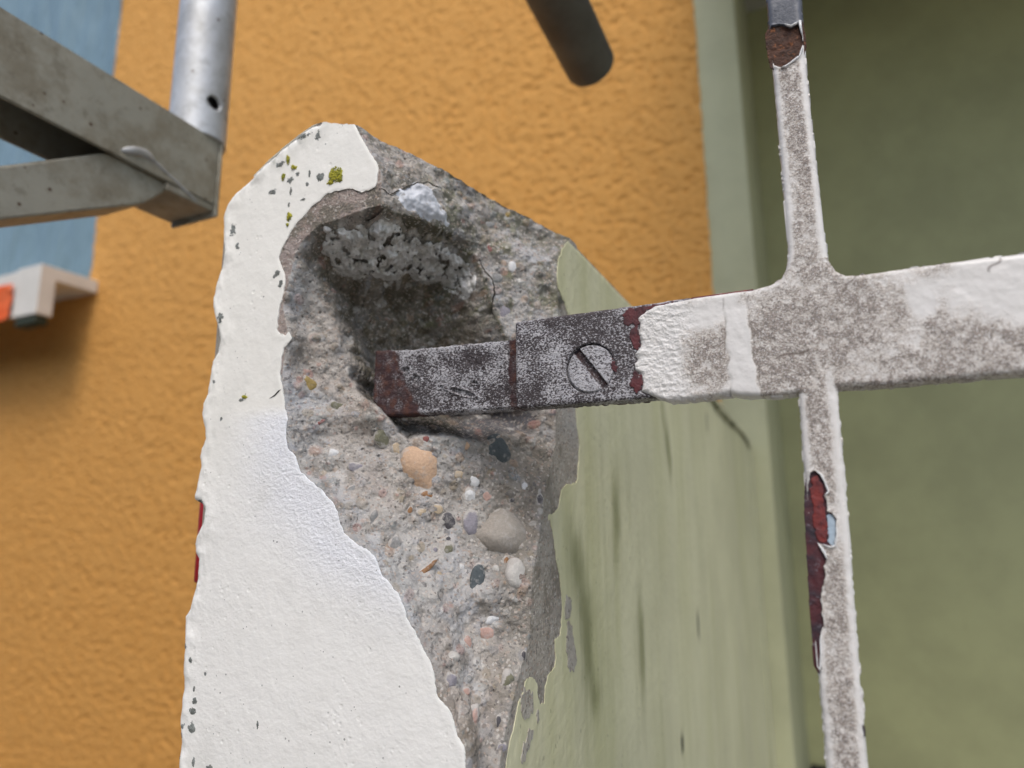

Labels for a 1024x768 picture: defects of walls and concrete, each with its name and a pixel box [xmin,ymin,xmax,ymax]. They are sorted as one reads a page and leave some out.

spalling [277,124,579,768]